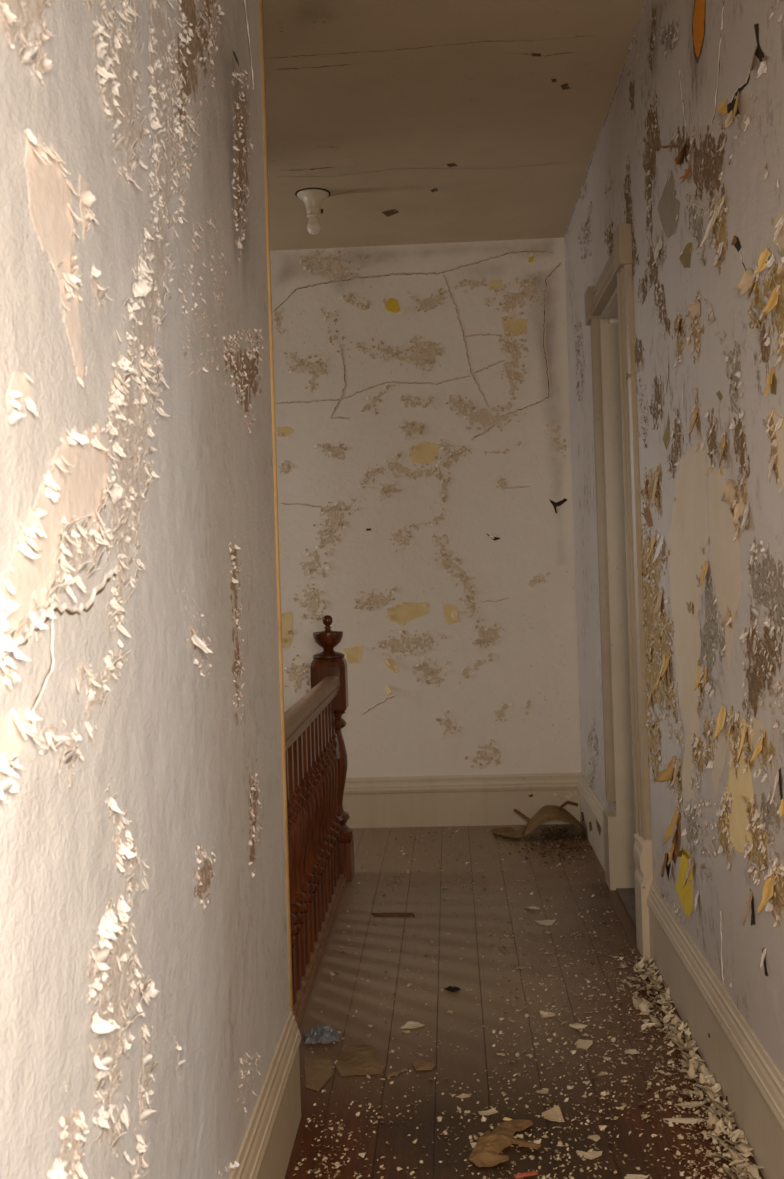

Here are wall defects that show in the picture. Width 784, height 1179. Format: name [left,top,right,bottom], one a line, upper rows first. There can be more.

spalling [646,0,706,74]
crack [679,0,755,127]
peeling [746,46,767,79]
peeling [0,0,264,803]
peeling [283,253,546,687]
crack [272,249,562,440]
peeling [578,79,784,927]
peeling [194,845,216,914]
peeling [247,759,262,878]
peeling [47,783,160,1179]